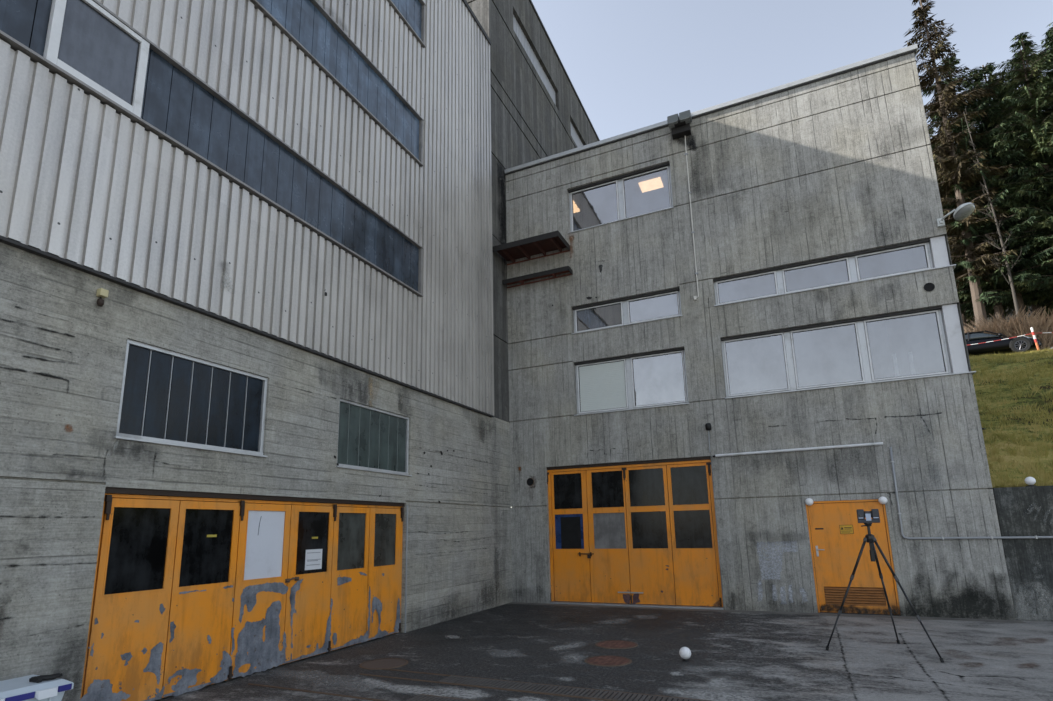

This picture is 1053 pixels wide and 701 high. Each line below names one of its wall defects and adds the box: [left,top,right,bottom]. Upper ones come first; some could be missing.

peeling [80,679,134,701]
peeling [121,572,401,701]